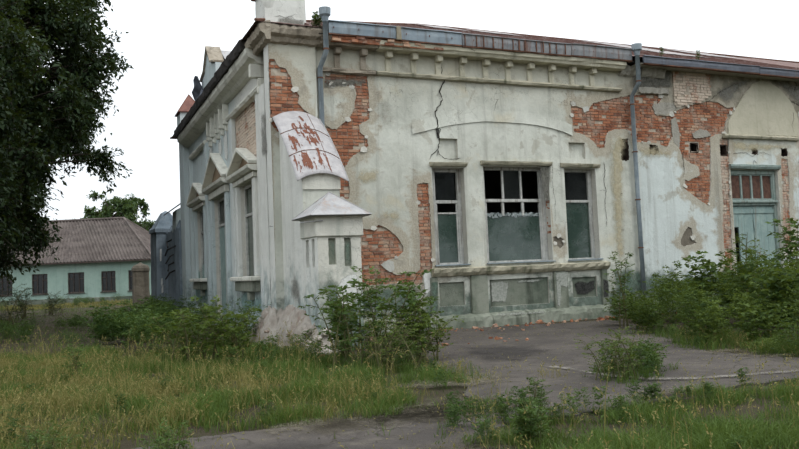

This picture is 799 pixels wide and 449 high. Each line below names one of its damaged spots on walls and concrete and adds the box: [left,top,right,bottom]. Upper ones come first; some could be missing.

flaking render [235,100,257,157]
flaking render [268,58,307,138]
rust [288,116,332,173]
flaking render [325,72,373,199]
crack [430,67,459,160]
flaking render [570,71,735,274]
flaking render [338,183,435,306]